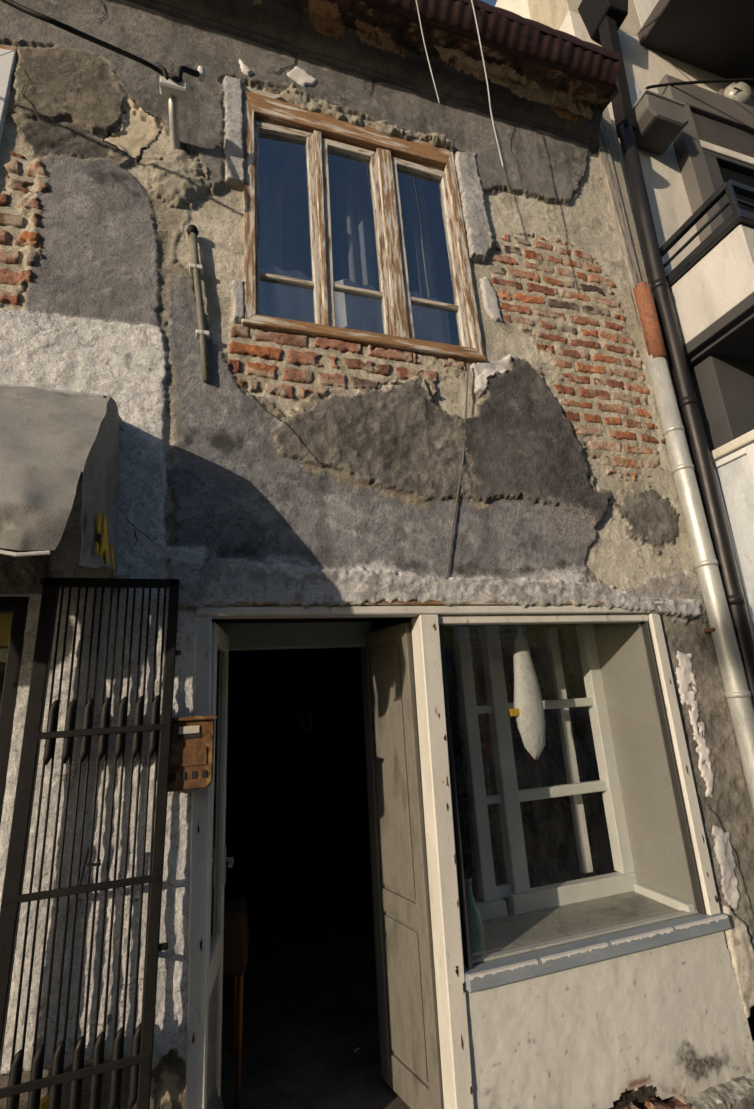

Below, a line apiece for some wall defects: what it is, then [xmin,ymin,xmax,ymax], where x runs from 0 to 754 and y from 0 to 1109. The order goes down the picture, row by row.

peeling [308,0,406,58]
peeling [434,45,594,124]
flaking render [0,151,51,310]
flaking render [223,323,512,402]
flaking render [479,231,663,481]
crack [708,804,754,914]
spalling [150,1066,181,1109]
damp [686,1044,722,1081]